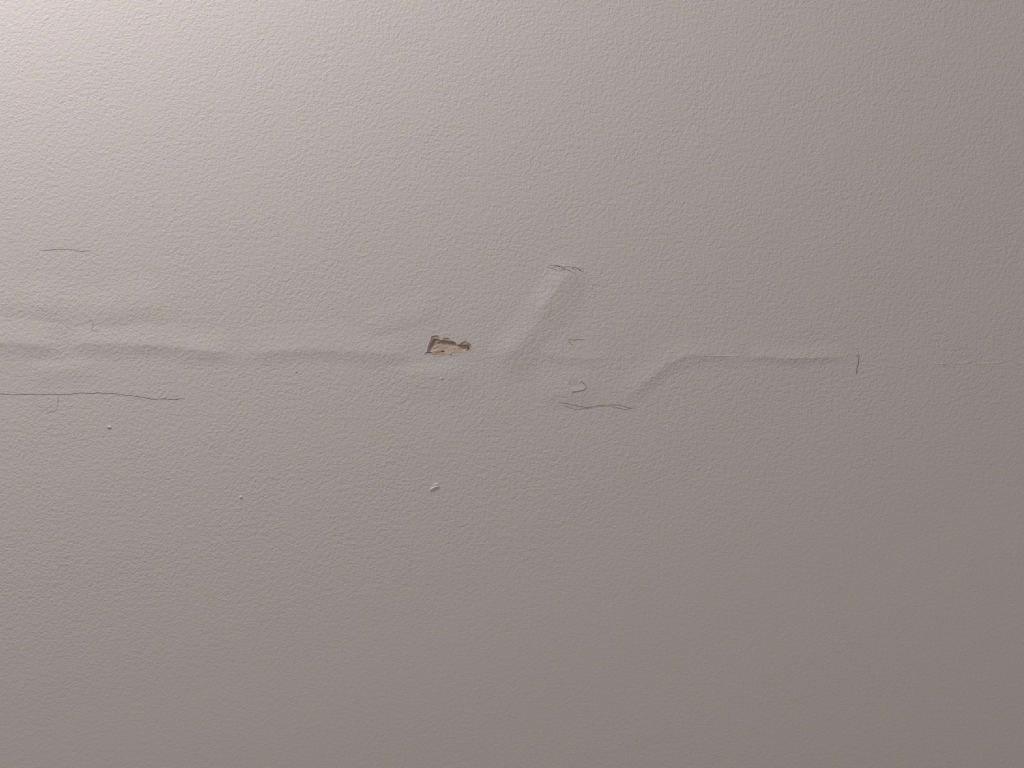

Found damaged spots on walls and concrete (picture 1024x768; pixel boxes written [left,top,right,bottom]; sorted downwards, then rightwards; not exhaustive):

crack [3,392,182,412]